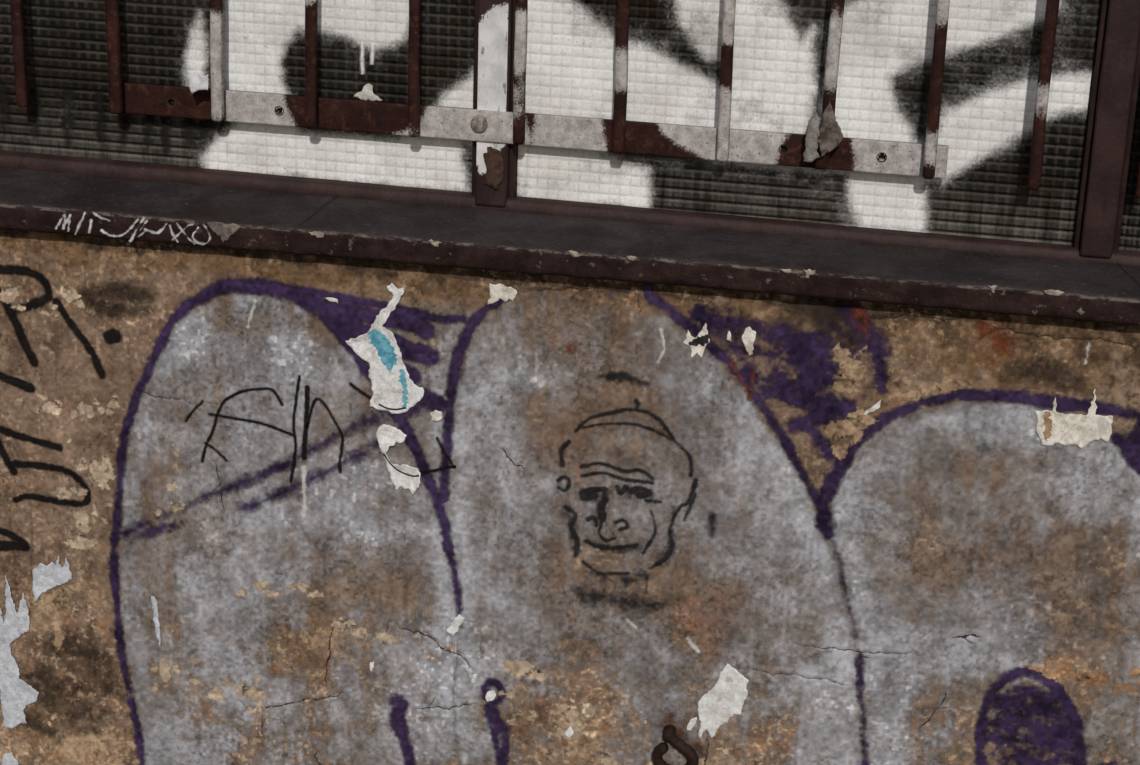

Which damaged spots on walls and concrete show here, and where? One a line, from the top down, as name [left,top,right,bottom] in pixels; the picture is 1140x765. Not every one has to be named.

flaking render [823,343,879,460]
flaking render [22,573,109,650]
crack [237,613,355,745]
crack [757,670,861,686]
crack [793,643,924,658]